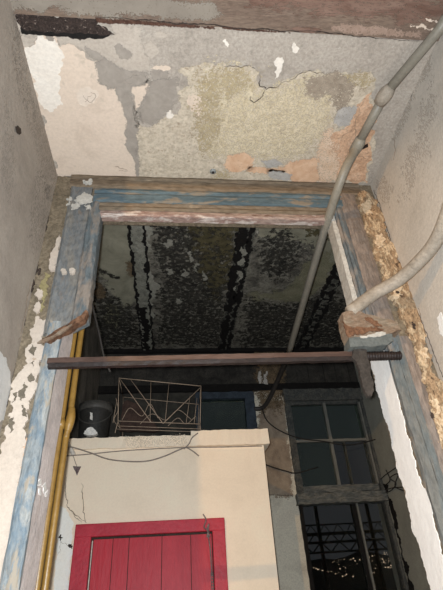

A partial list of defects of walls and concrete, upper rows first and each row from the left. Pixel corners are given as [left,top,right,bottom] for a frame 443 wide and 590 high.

peeling [10,0,376,185]
crack [225,65,317,103]
peeling [66,192,93,210]
spalling [357,190,402,282]
peeling [0,235,76,578]
spalling [388,282,443,449]
crack [65,477,86,522]